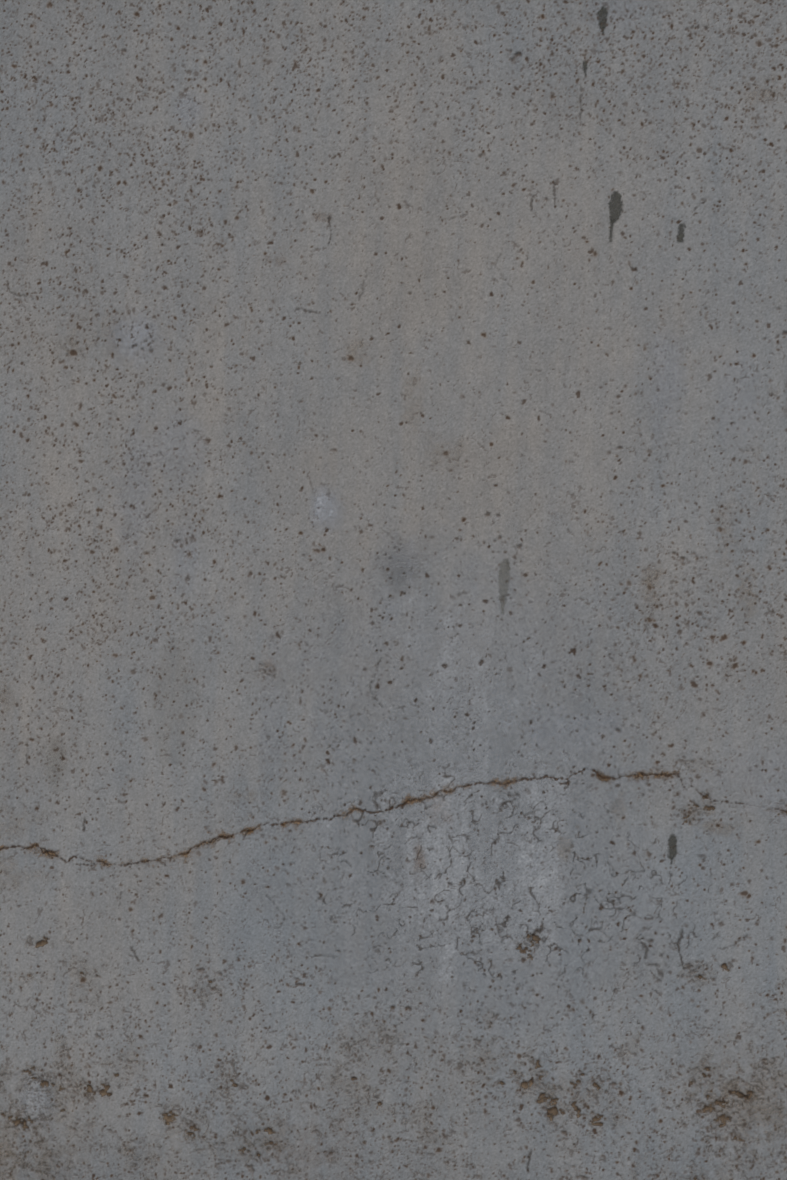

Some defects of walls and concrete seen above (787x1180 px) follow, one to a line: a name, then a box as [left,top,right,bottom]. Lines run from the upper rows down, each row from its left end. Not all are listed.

leakage [598,7,608,33]
leakage [608,191,622,242]
crack [0,769,742,977]